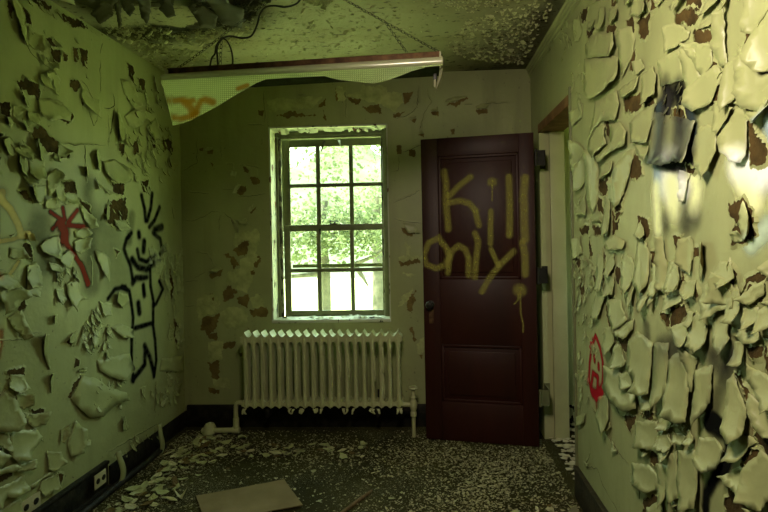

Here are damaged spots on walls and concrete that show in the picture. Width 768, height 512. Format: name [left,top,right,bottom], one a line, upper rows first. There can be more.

peeling [0,364,91,512]
peeling [64,291,165,481]
peeling [0,0,553,394]
peeling [568,0,768,512]